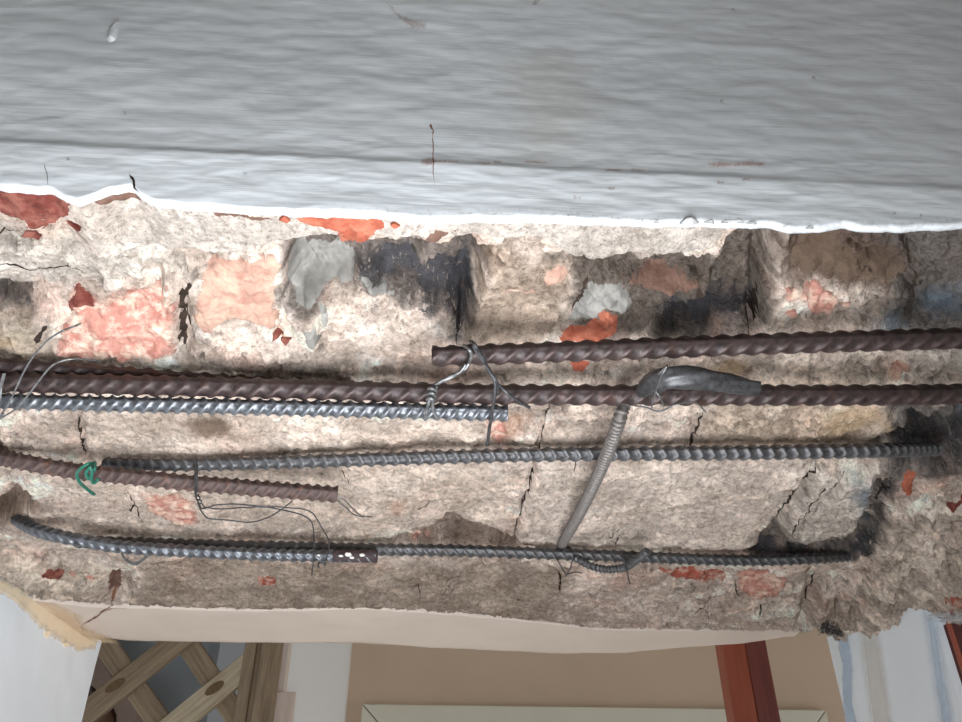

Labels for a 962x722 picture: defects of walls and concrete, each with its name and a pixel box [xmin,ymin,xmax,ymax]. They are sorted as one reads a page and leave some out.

spalling [0,191,82,240]
spalling [95,192,141,205]
spalling [213,212,400,243]
spalling [56,277,177,364]
crack [178,282,192,348]
spalling [192,253,292,346]
damp [358,242,472,342]
spalling [559,310,618,342]
crack [513,404,550,536]
crack [748,464,844,549]
spalling [42,568,95,581]
spalling [108,568,122,589]